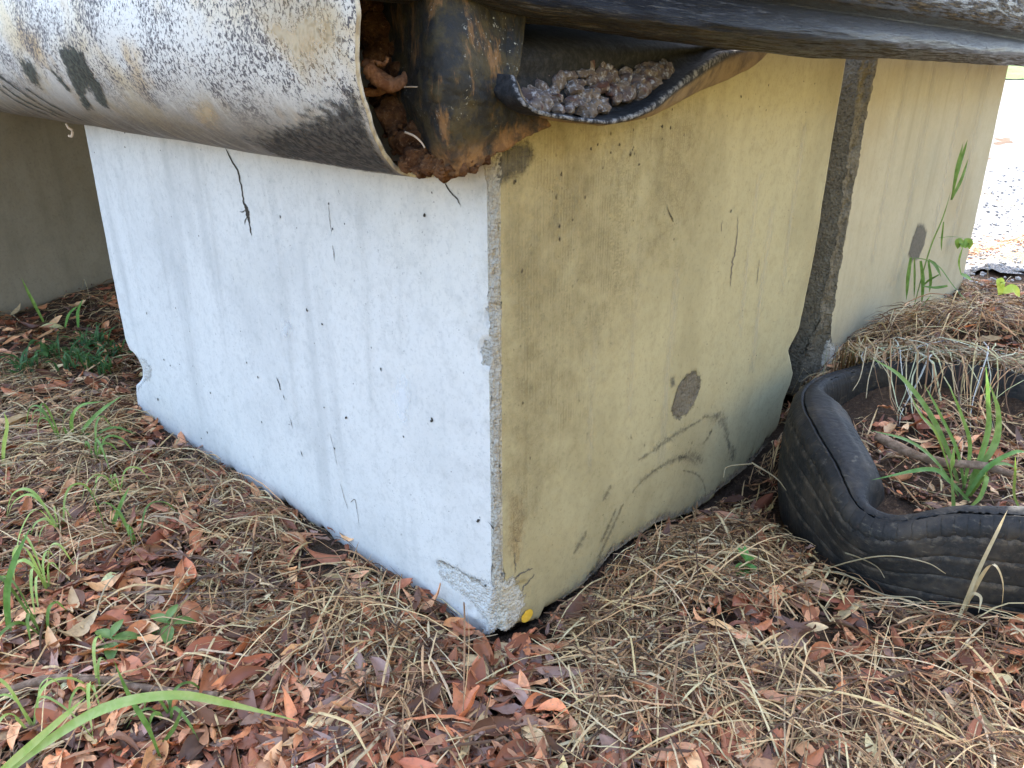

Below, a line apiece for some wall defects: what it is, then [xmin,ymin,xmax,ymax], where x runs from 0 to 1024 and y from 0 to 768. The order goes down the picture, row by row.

crack [225,148,252,236]
spalling [436,152,527,635]